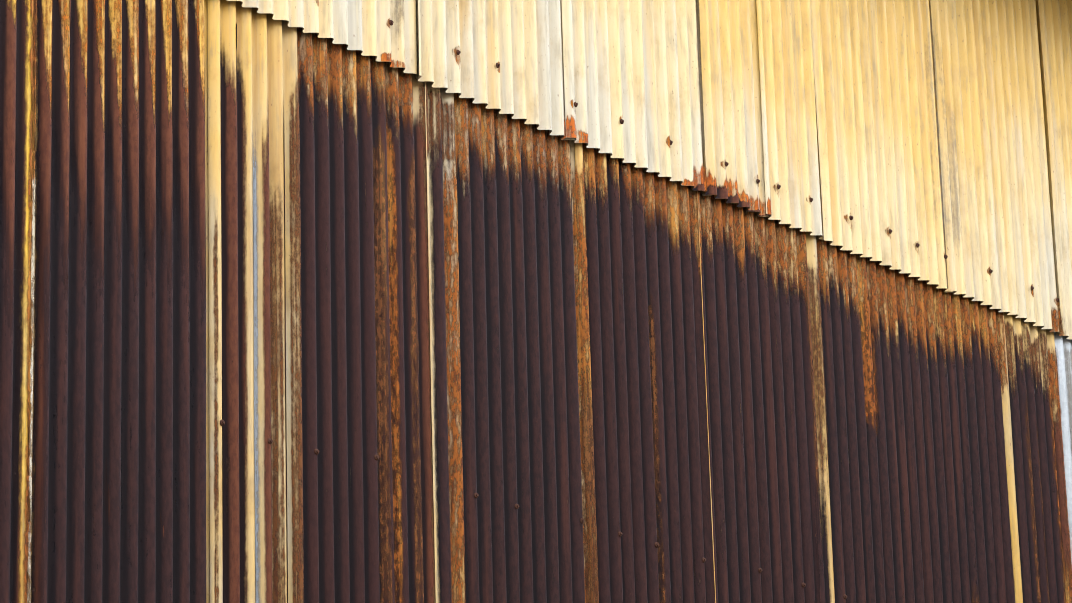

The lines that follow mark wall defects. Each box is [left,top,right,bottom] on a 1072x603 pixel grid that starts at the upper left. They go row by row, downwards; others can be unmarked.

rust [0,0,248,603]
rust [262,27,1072,603]